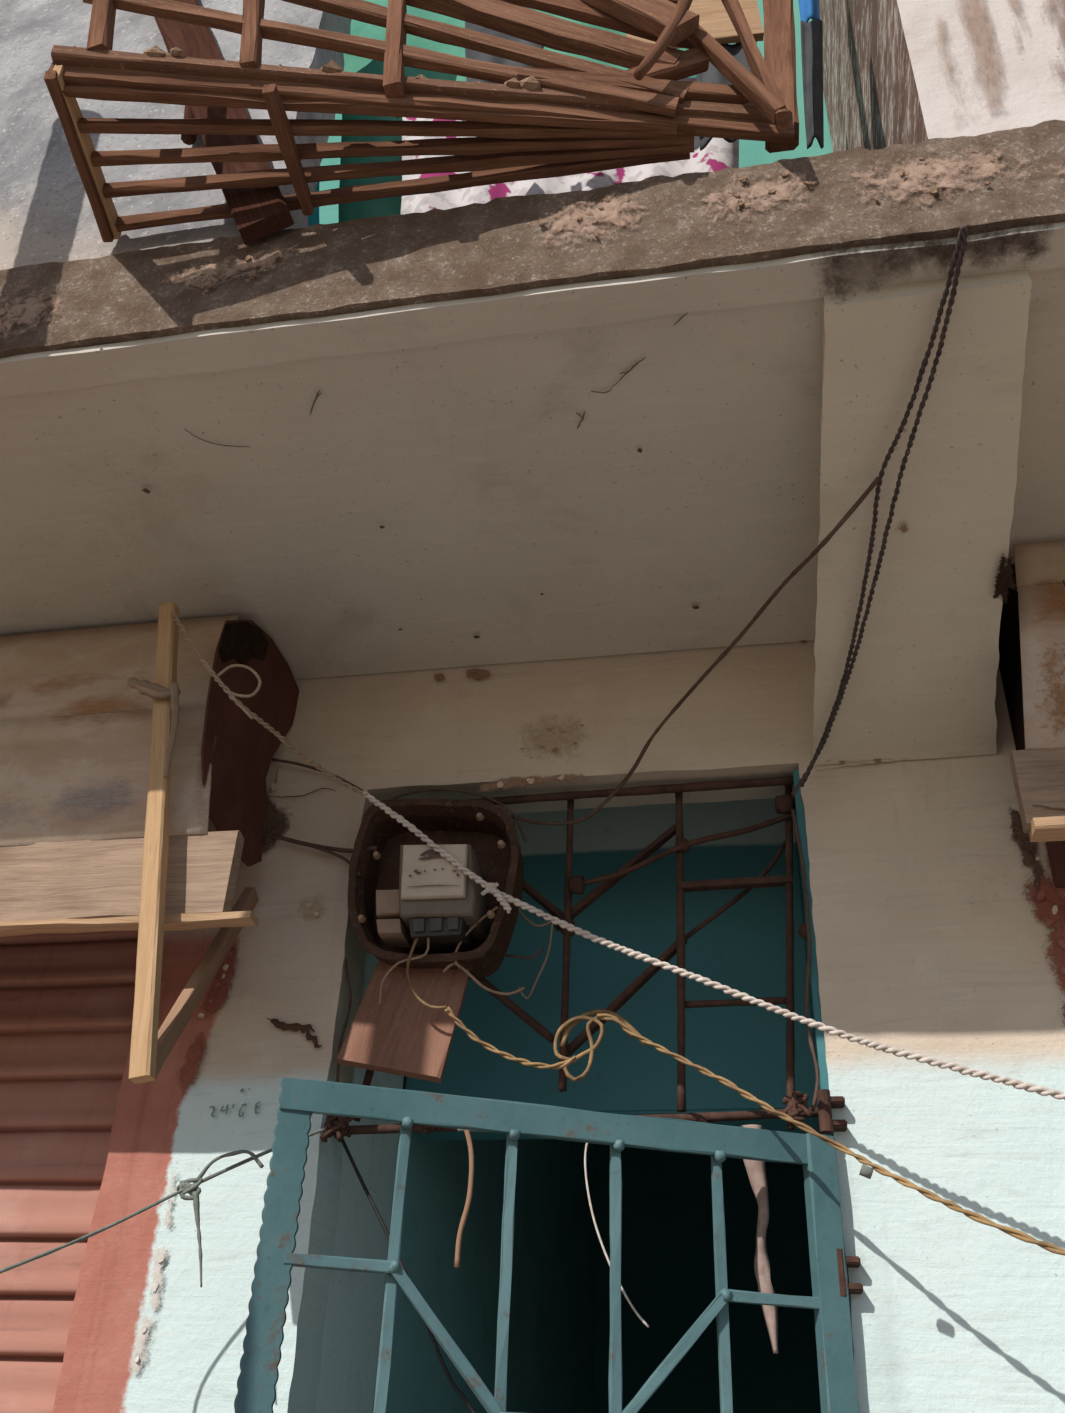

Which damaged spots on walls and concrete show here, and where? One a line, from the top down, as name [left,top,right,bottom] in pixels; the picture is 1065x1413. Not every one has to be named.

spalling [850,148,1030,205]
leakage [822,219,1053,301]
spalling [0,284,64,339]
crack [267,1018,322,1048]